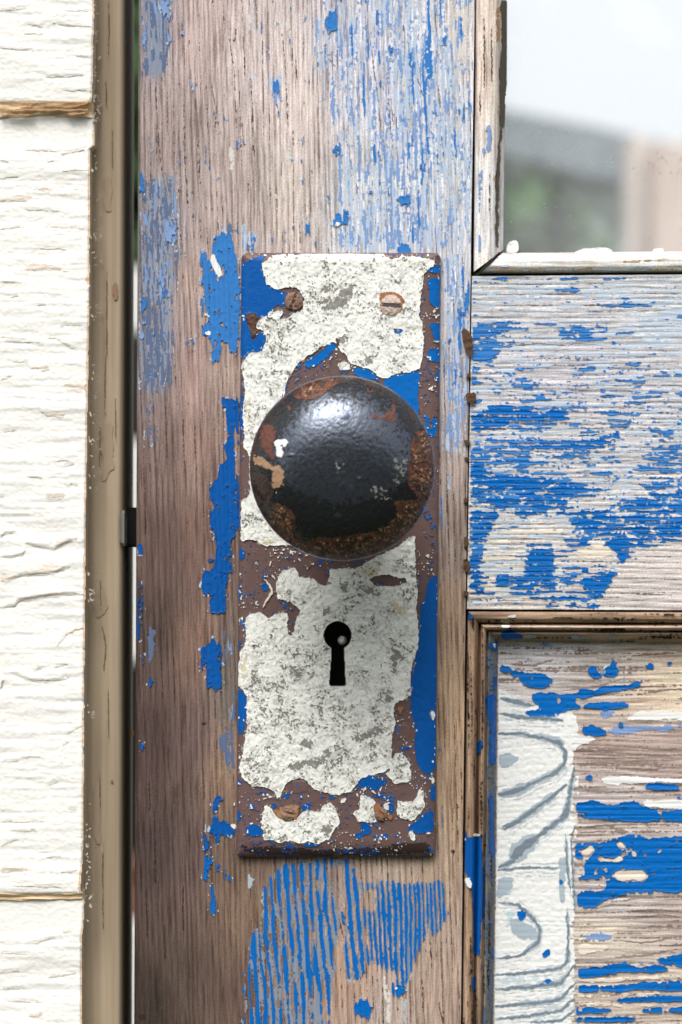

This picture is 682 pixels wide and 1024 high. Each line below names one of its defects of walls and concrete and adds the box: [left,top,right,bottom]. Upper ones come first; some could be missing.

peeling [188,236,224,350]
rust [379,292,405,312]
rust [250,377,434,560]
spalling [201,237,439,879]
rust [274,805,300,820]